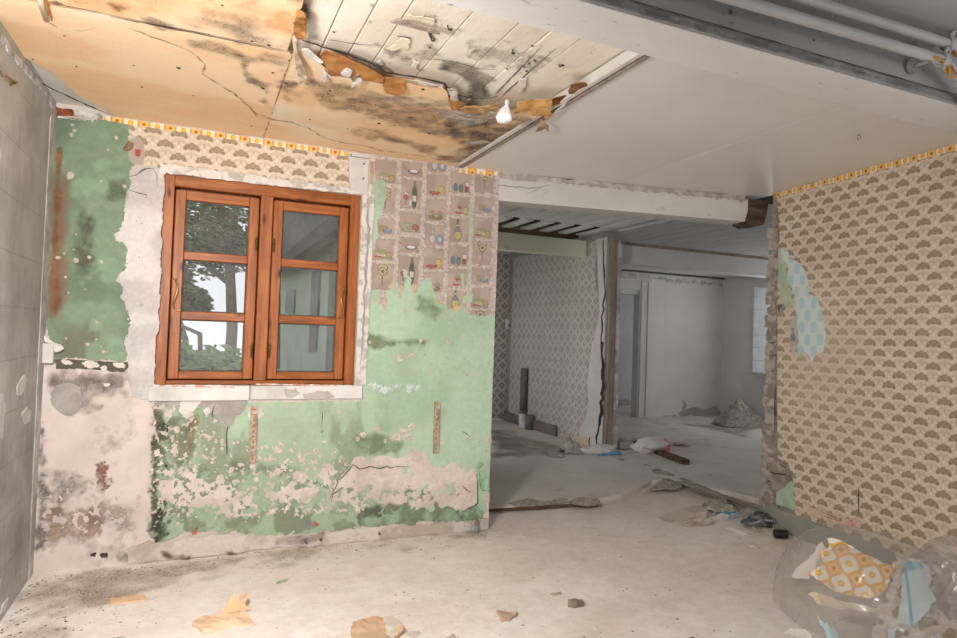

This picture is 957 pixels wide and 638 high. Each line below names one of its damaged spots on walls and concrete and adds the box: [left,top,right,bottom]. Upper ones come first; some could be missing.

crack [31,0,292,109]
peeling [387,14,441,69]
water stain [424,45,503,97]
water stain [312,83,516,164]
peeling [0,31,146,387]
peeling [372,178,387,252]
water stain [49,372,124,407]
peeling [40,205,495,558]
spalling [759,228,796,511]
water stain [35,450,130,549]